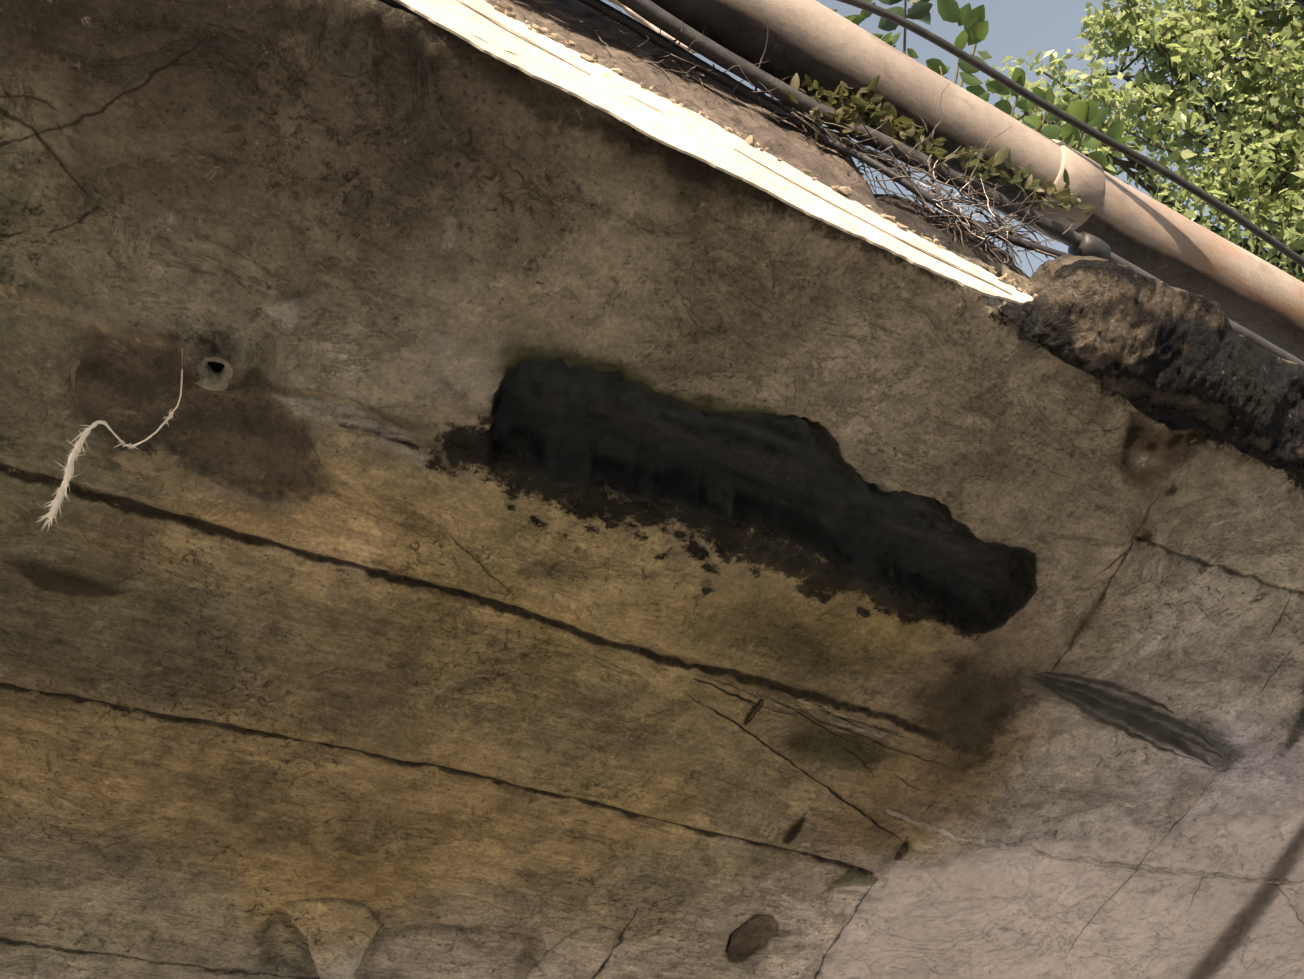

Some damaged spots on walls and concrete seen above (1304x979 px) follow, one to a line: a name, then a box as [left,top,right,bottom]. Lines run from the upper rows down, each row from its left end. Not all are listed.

crack [0,32,214,237]
spalling [484,0,709,119]
spalling [724,126,783,161]
spalling [831,185,1038,306]
crack [452,537,516,597]
spalling [67,329,1037,641]
crack [1044,491,1161,678]
crack [1261,591,1304,692]
crack [681,674,954,847]
crack [815,875,878,979]
leakage [821,660,1304,979]
crack [1062,782,1211,964]